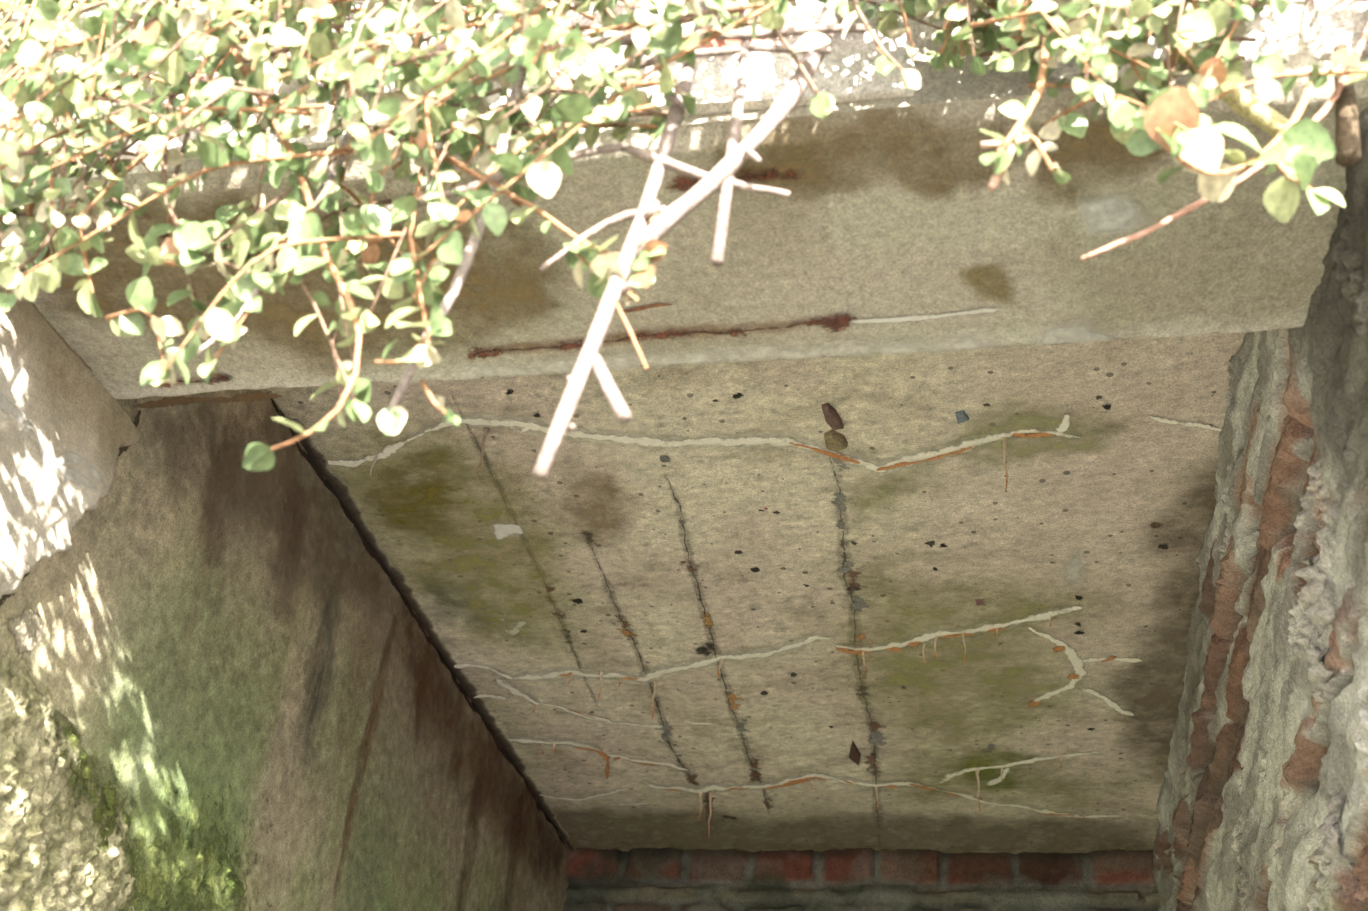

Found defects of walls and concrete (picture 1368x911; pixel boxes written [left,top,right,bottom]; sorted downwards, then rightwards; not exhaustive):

water stain [965,268,1008,298]
rust [603,314,857,343]
rust [468,341,584,361]
water stain [492,524,523,540]
crack [267,392,1143,850]
spalling [0,572,138,911]